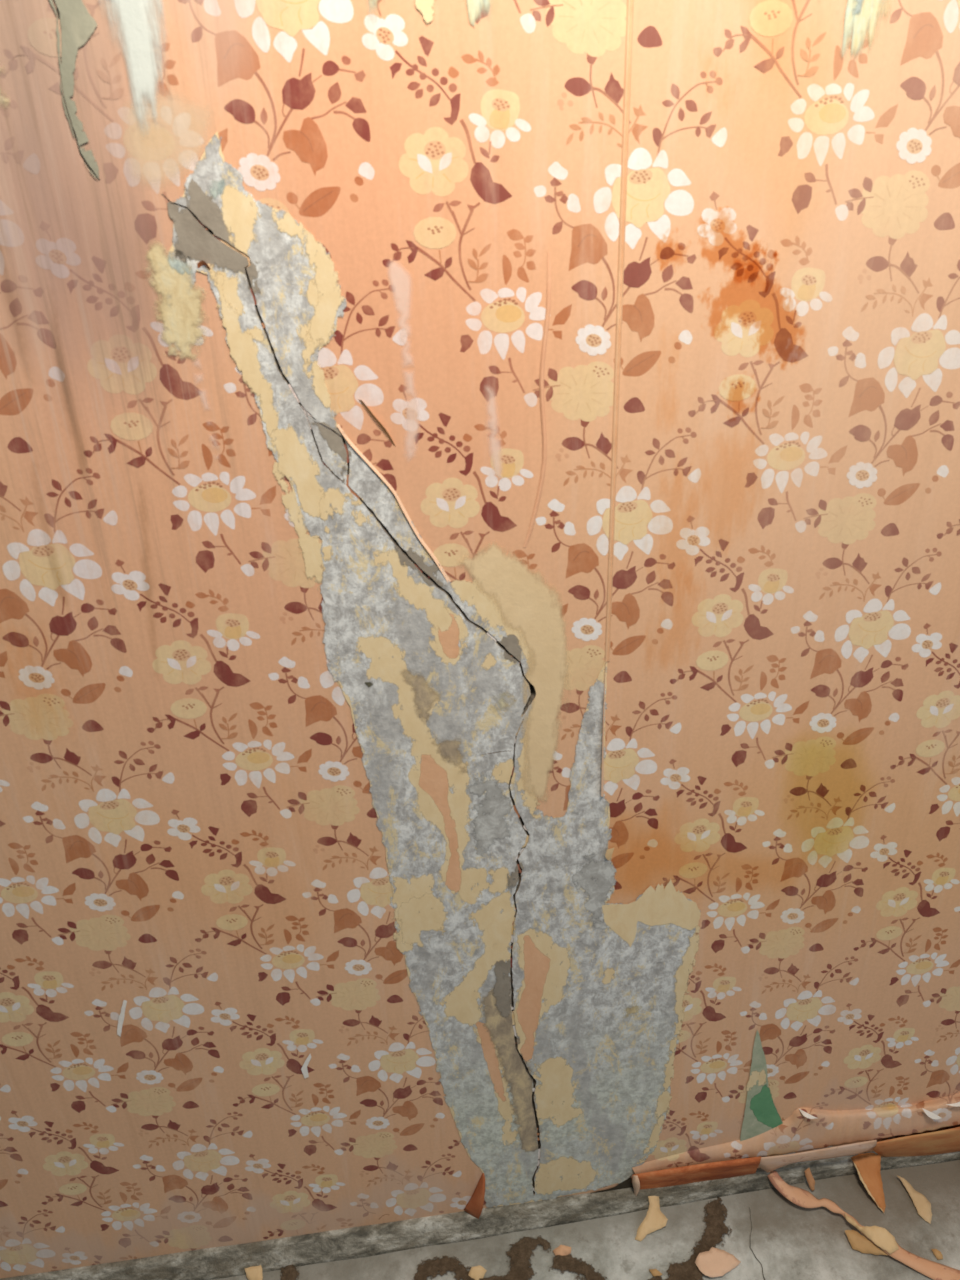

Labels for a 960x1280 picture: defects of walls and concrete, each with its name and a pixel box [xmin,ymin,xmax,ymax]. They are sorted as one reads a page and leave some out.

peeling [415,0,434,23]
peeling [467,0,491,25]
peeling [843,0,888,54]
peeling [49,0,99,179]
crack [162,194,541,1194]
peeling [167,131,701,1208]
peeling [740,1030,783,1141]